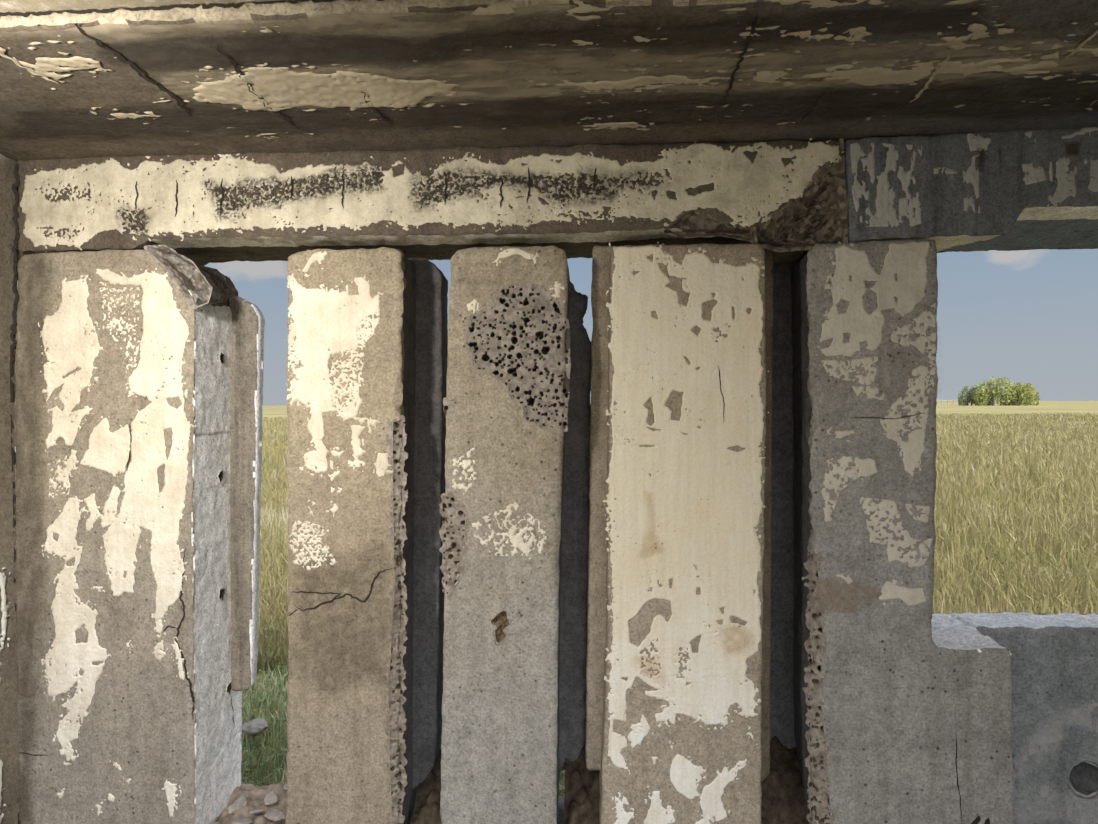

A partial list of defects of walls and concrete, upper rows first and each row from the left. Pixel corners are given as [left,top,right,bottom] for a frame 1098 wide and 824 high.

peeling [0,35,117,90]
crack [0,0,384,116]
peeling [90,63,474,124]
crack [724,13,758,98]
peeling [527,0,1098,131]
crack [909,52,951,103]
damp [126,181,148,234]
damp [204,165,382,218]
damp [411,168,649,208]
peeling [20,138,937,824]
crack [289,567,395,616]
peeling [0,567,11,680]